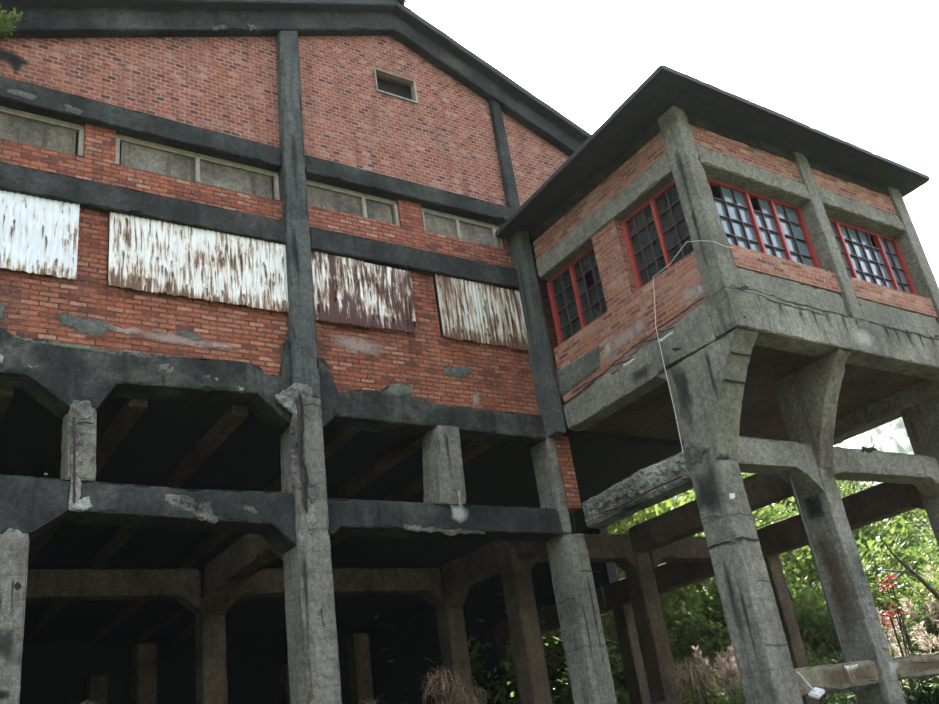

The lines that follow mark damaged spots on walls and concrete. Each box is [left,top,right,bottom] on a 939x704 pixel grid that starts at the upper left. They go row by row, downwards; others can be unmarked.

corrosion [138,245,190,286]
corrosion [334,264,378,302]
corrosion [481,300,525,343]
spalling [69,400,93,512]
spalling [274,383,317,536]
spalling [165,494,223,524]